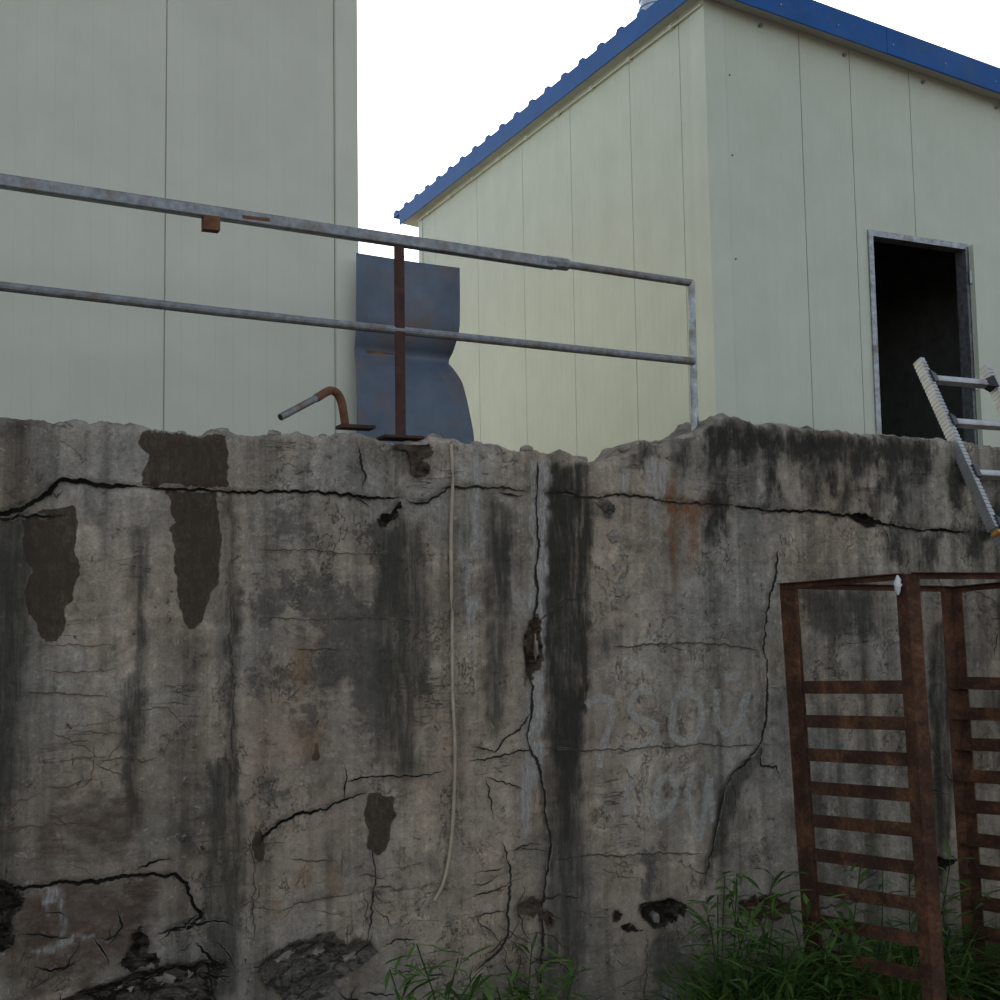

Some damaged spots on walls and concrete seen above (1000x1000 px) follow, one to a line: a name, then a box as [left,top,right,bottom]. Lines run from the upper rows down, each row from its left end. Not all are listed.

damp [138,430,234,629]
spalling [0,880,25,953]
damp [0,505,80,789]
spalling [61,926,227,1000]
damp [208,759,265,995]
spalling [257,931,378,1000]
damp [247,513,428,773]
damp [364,792,396,855]
crack [0,443,966,1000]
spalling [523,613,544,680]
damp [522,462,592,1000]
spalling [613,898,688,933]